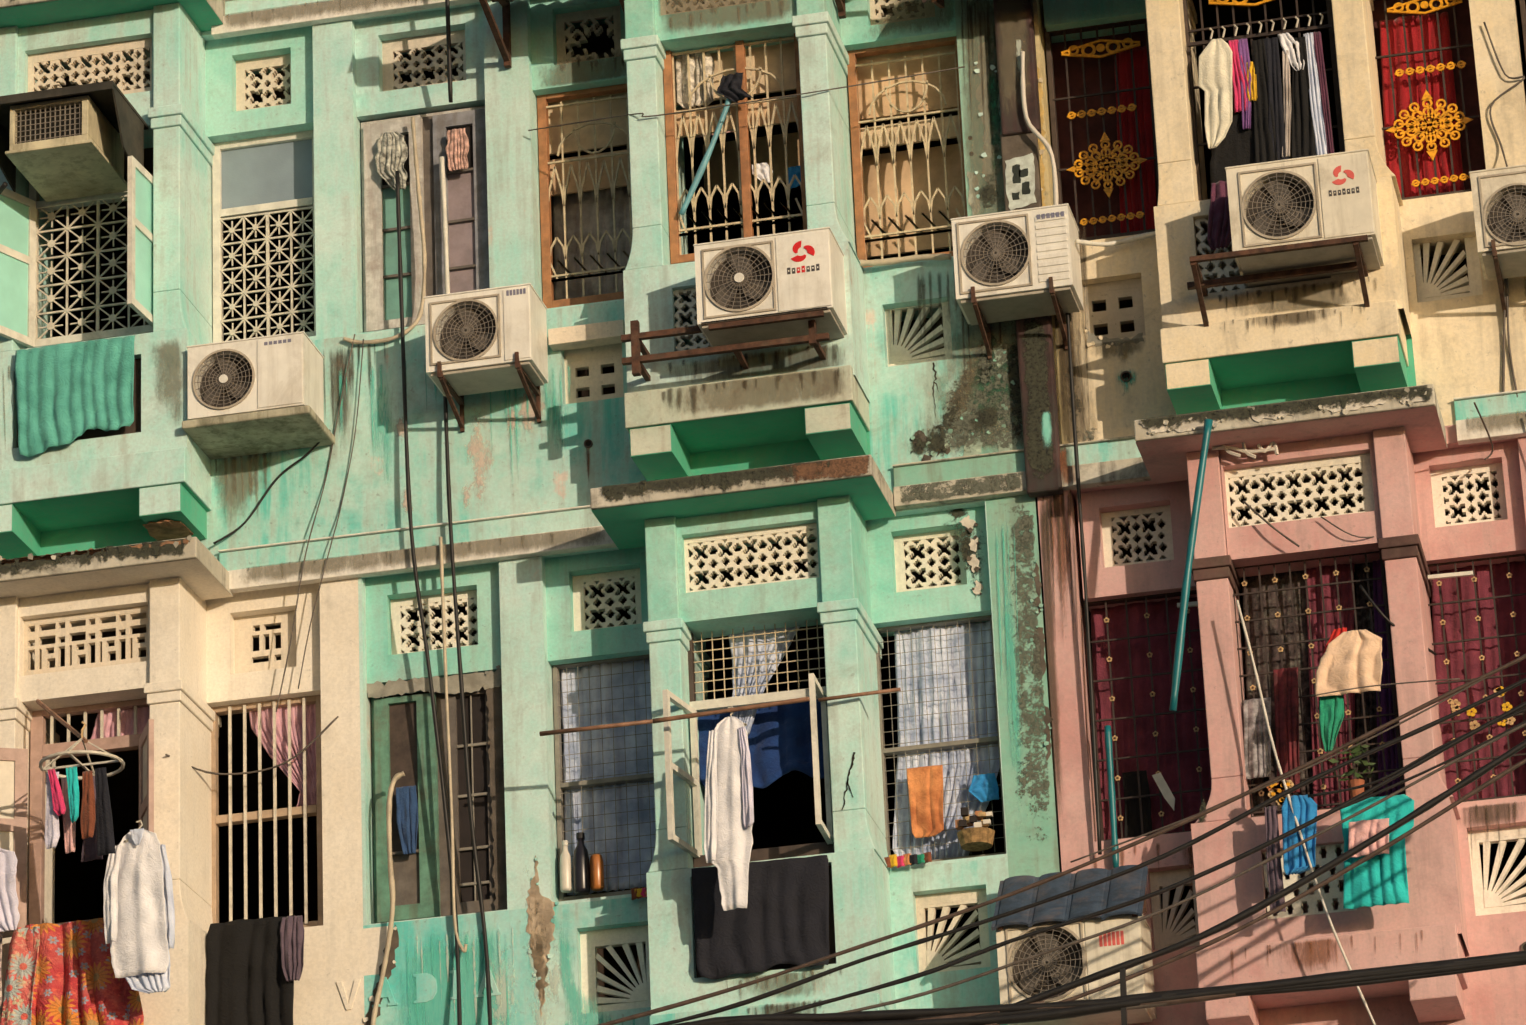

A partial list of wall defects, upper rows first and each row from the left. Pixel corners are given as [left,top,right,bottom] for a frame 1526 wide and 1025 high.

peeling [959,515,983,595]
leakage [900,229,1097,840]
peeling [367,665,507,910]
peeling [526,855,562,1025]